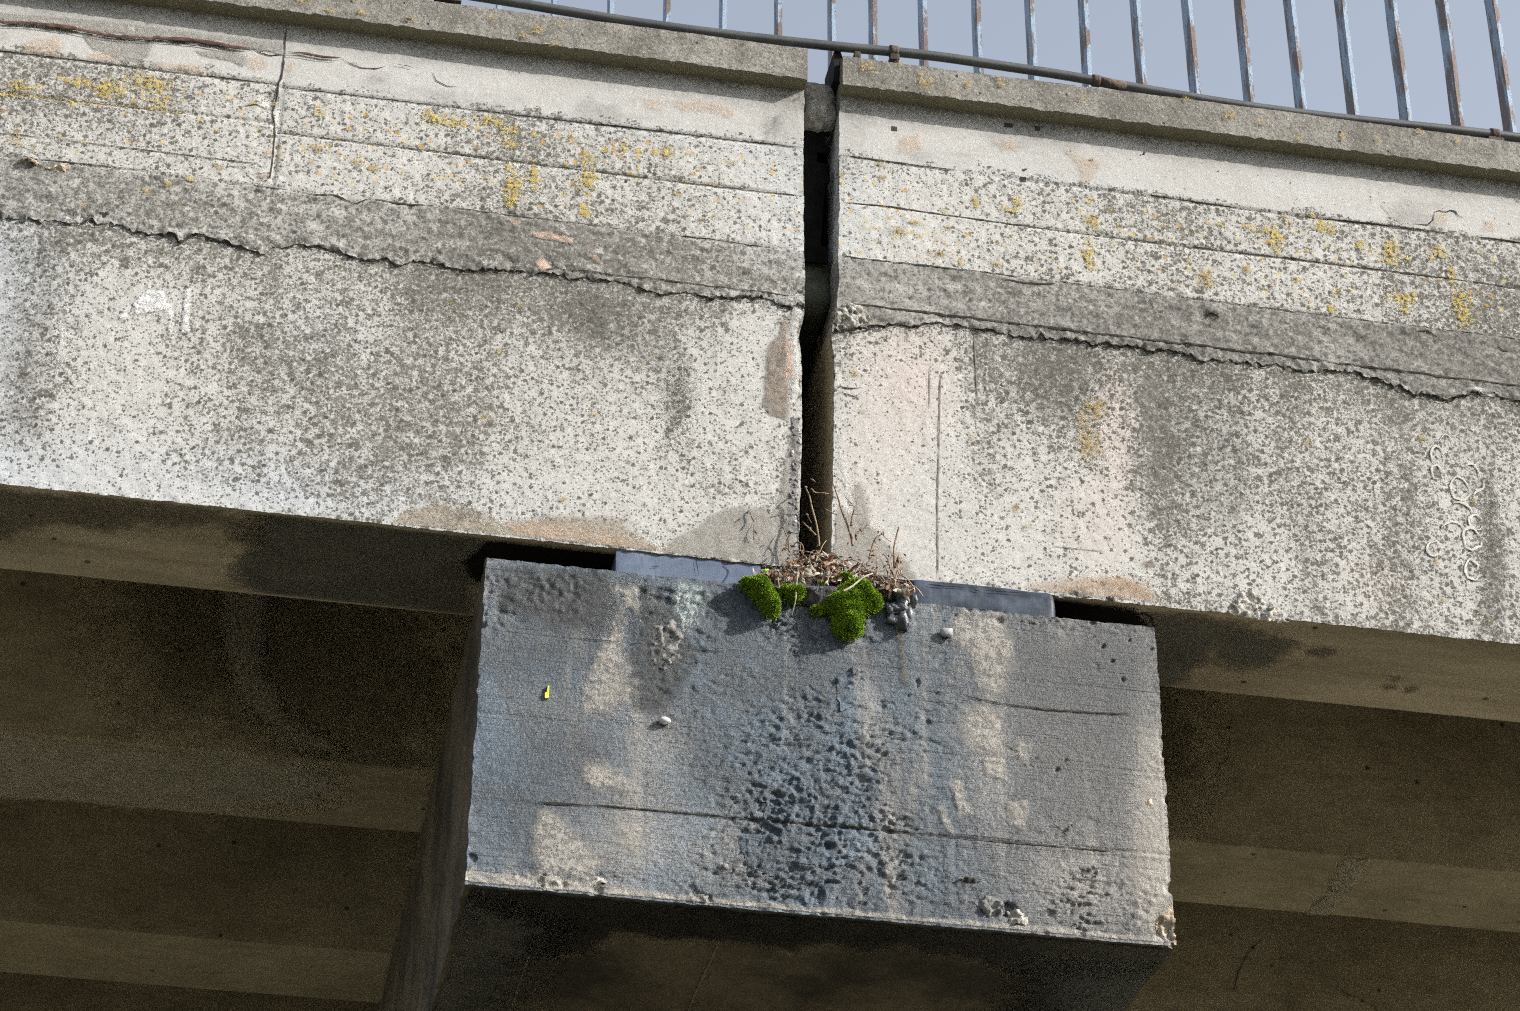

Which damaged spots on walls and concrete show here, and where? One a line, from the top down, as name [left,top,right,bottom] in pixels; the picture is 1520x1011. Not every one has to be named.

crack [0,0,803,251]
flaking render [510,219,572,243]
spalling [833,302,871,332]
leakage [954,611,1031,780]
leakage [436,732,1171,1011]